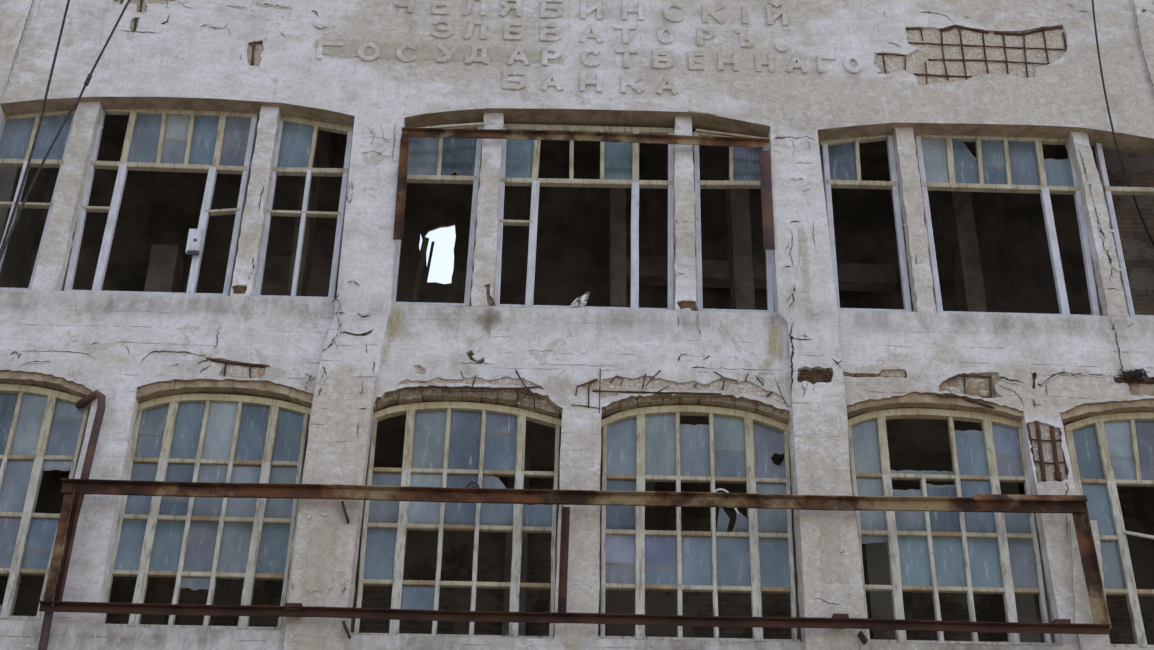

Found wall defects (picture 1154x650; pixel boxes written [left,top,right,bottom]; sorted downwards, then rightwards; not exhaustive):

spalling [116,0,172,34]
spalling [247,41,263,67]
spalling [874,25,1067,85]
crack [775,136,816,192]
crack [1079,151,1120,291]
crack [677,221,816,407]
crack [306,280,375,438]
spalling [797,367,907,384]
spalling [937,374,1000,409]
spalling [1114,377,1154,389]
spalling [1024,421,1068,483]